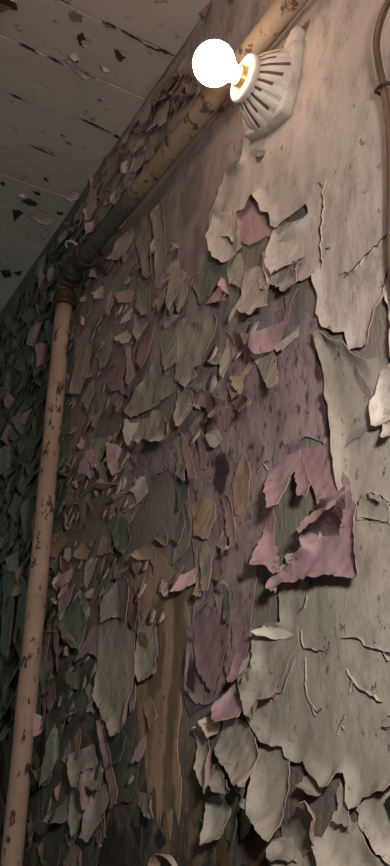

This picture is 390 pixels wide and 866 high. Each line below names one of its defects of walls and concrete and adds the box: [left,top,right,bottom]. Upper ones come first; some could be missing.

peeling [0,0,18,12]
peeling [16,33,111,80]
peeling [114,49,129,62]
crack [318,179,386,279]
peeling [380,408,390,438]
flaking render [23,101,324,866]
peeling [249,444,390,593]
crack [357,492,390,524]
peeling [153,497,390,866]
crack [264,594,324,716]
crack [341,636,390,661]
crack [346,669,390,730]